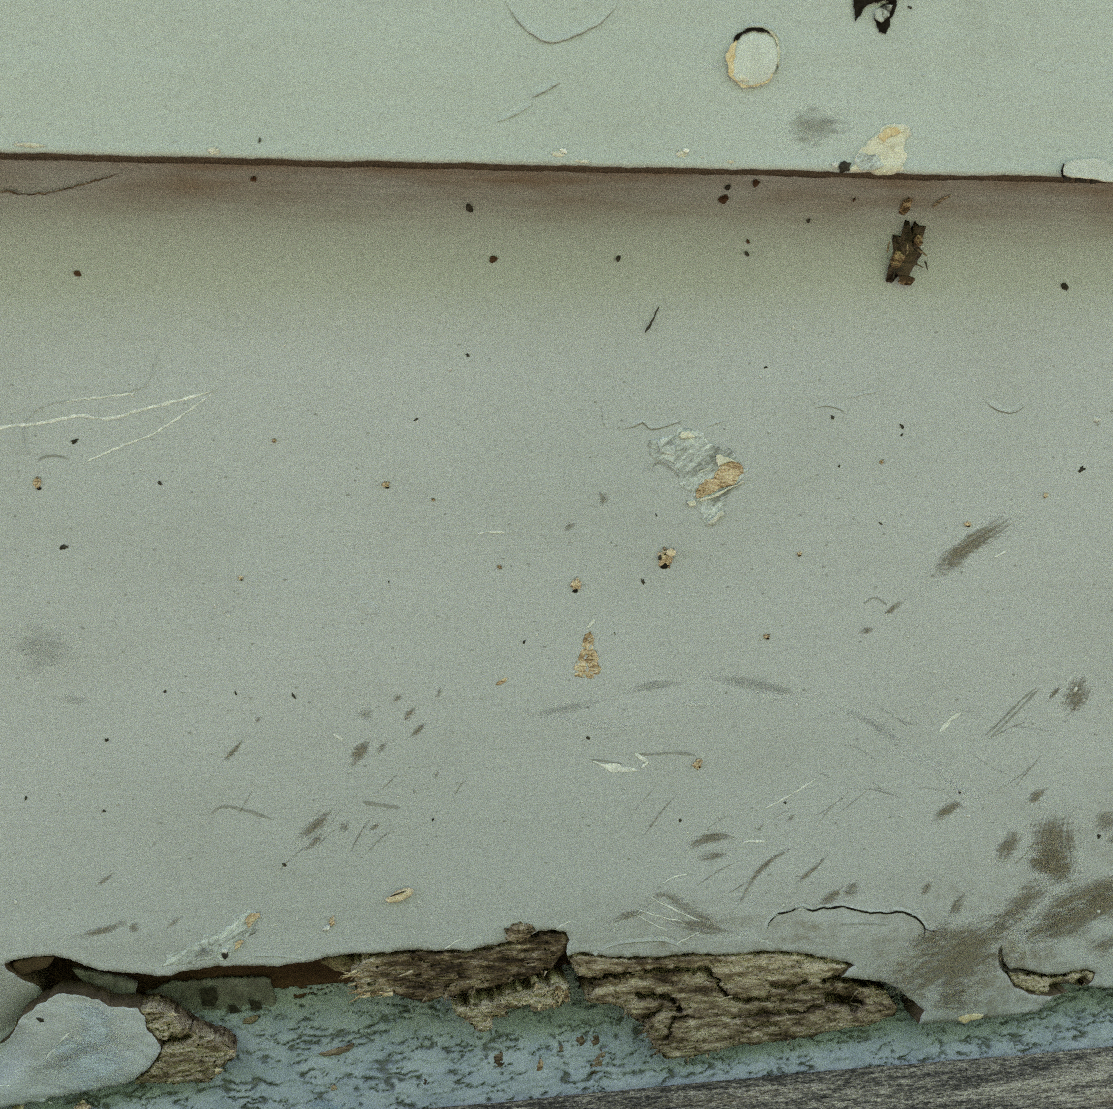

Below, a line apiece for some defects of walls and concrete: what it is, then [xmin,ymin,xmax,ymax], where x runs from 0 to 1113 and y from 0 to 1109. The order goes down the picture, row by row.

spalling [853,0,897,34]
peeling [831,123,912,175]
peeling [647,428,749,526]
peeling [163,909,263,967]
crack [763,902,939,939]
peeling [4,964,1113,1109]